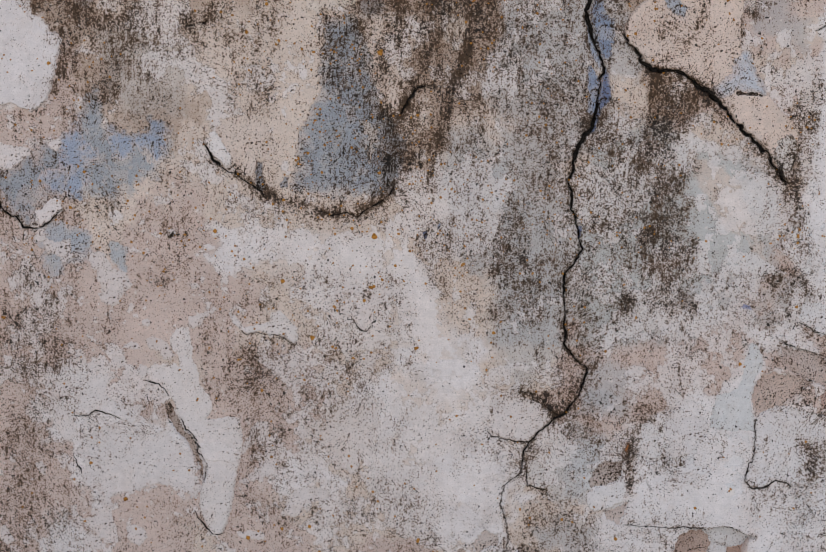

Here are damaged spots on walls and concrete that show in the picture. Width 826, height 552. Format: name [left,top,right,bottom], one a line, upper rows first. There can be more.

peeling [0,0,63,113]
peeling [0,84,177,306]
peeling [209,115,278,192]
peeling [280,0,405,201]
crack [624,34,788,183]
peeling [711,49,767,99]
peeling [228,310,299,344]
crack [488,0,605,545]
peeling [51,307,277,552]
peeling [315,395,381,477]
peeling [639,343,826,490]
spalling [673,526,752,552]